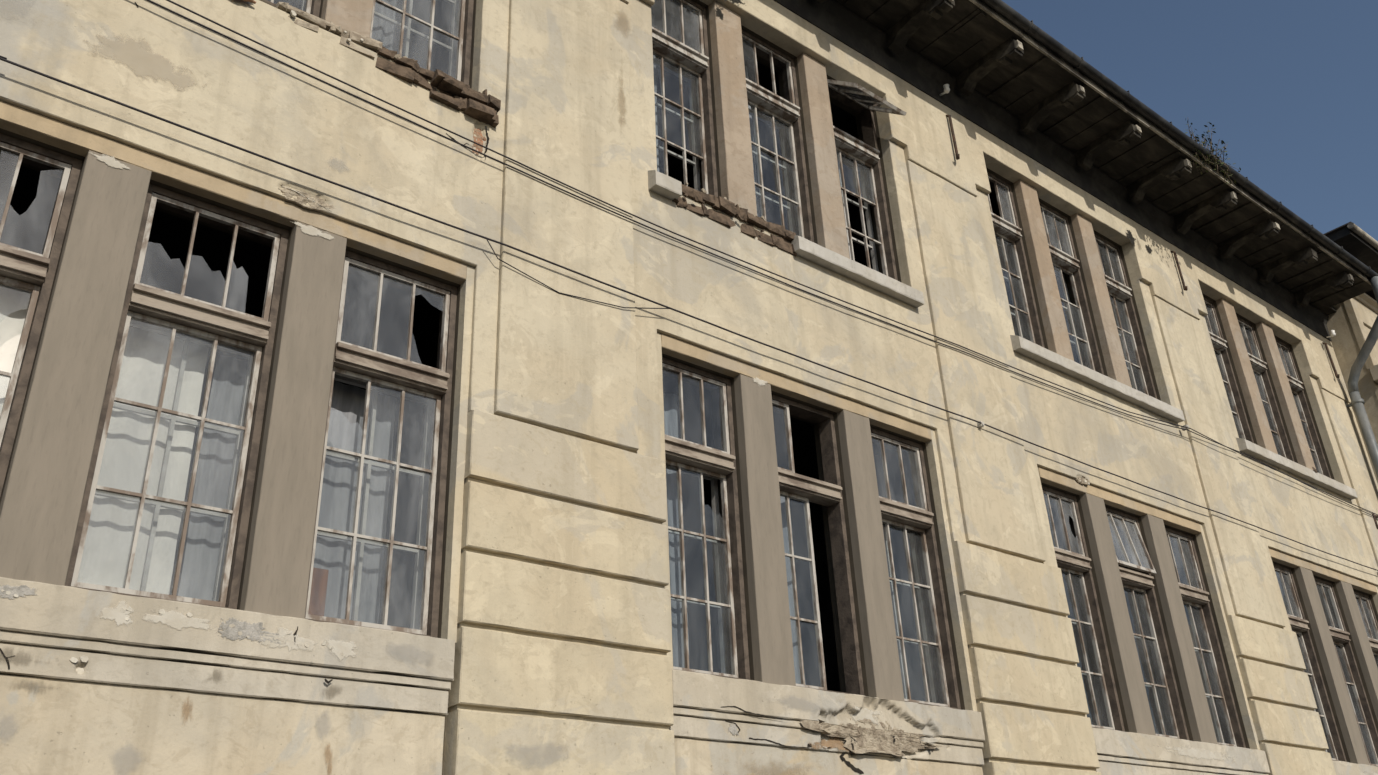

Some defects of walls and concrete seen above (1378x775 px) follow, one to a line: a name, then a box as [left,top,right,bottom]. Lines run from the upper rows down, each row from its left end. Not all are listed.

spalling [274,2,501,159]
spalling [672,183,797,257]
peeling [100,601,356,661]
spalling [801,706,942,756]